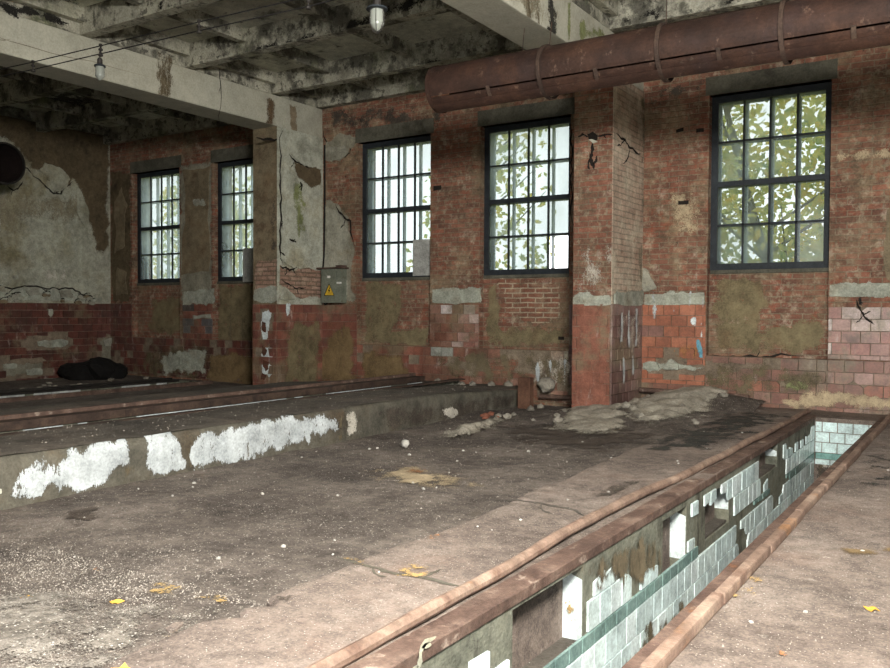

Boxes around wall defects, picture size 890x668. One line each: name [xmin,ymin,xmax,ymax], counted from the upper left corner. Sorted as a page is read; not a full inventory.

mould [0,2,70,25]
mould [384,0,425,19]
mould [245,15,370,52]
peeling [291,145,348,188]
crack [569,129,640,223]
peeling [0,115,131,318]
crack [0,285,91,297]
peeling [253,207,352,380]
peeling [432,289,480,305]
crack [856,300,873,324]
spalling [0,346,208,398]